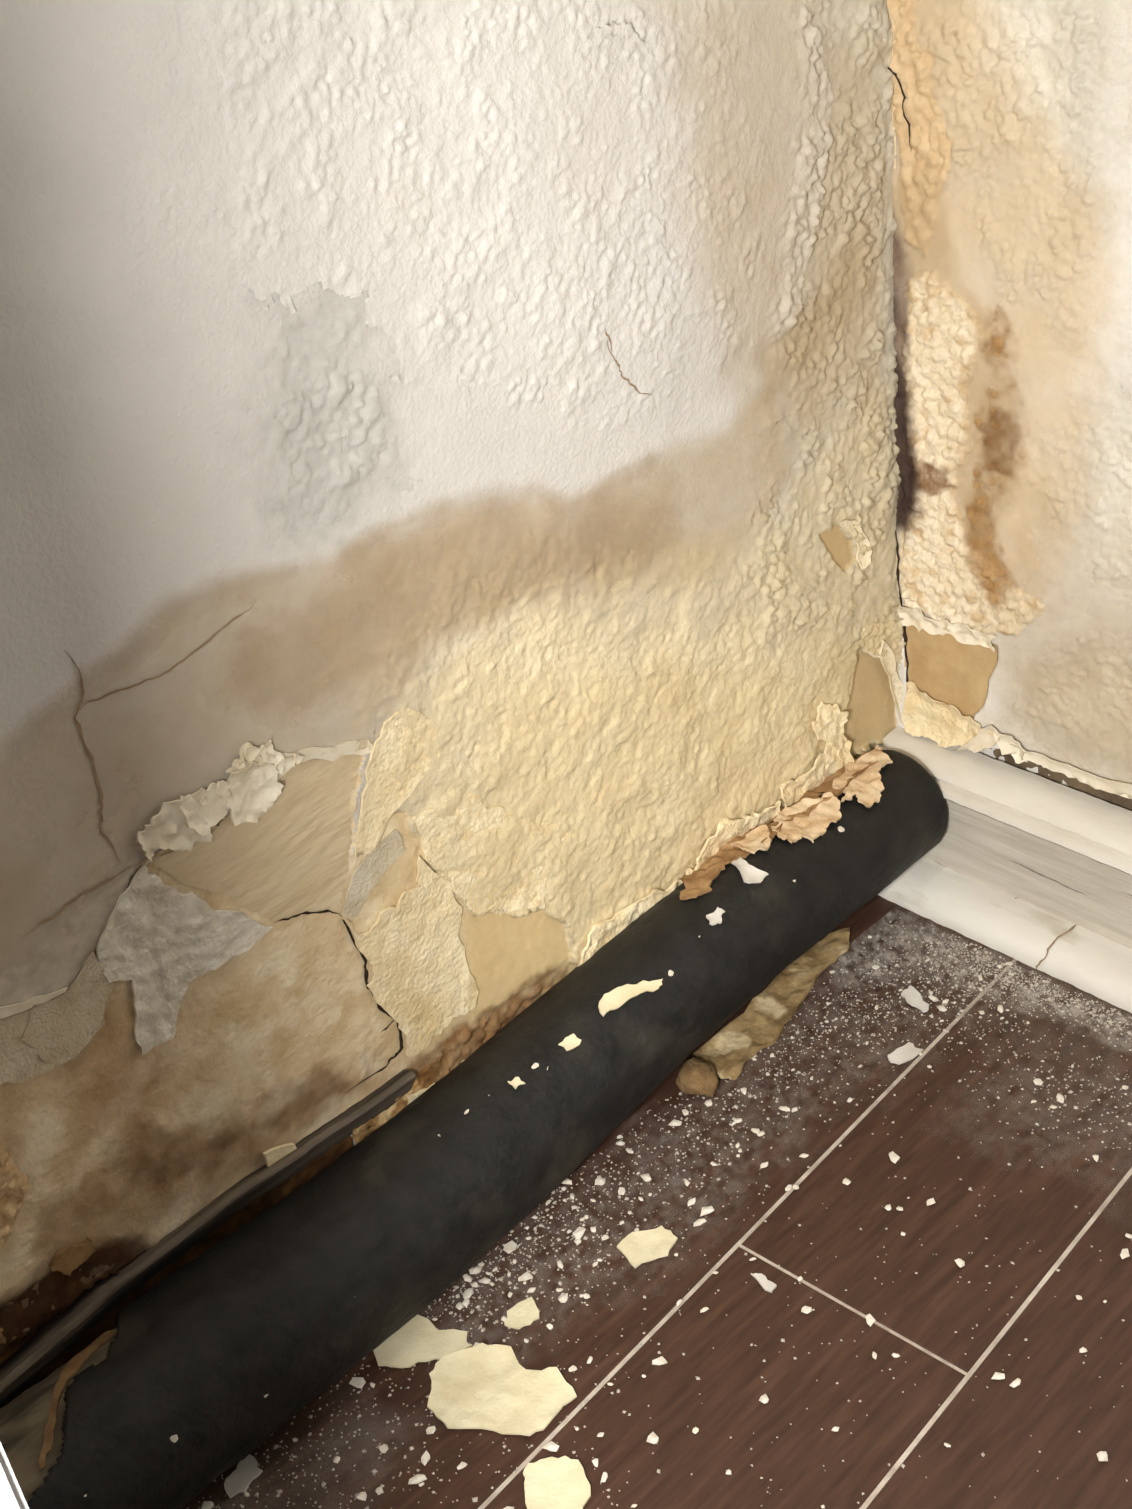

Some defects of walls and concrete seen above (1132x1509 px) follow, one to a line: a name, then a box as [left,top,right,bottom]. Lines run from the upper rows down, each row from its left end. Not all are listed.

water stain [887,0,1056,637]
crack [23,599,258,937]
peeling [680,605,1132,926]
water stain [0,865,139,1007]
peeling [0,707,581,1407]
peeling [598,979,663,1017]
peeling [888,1042,923,1065]
peeling [901,985,930,1013]
crack [1036,924,1077,969]
water stain [0,1237,151,1354]
peeling [751,1273,777,1293]